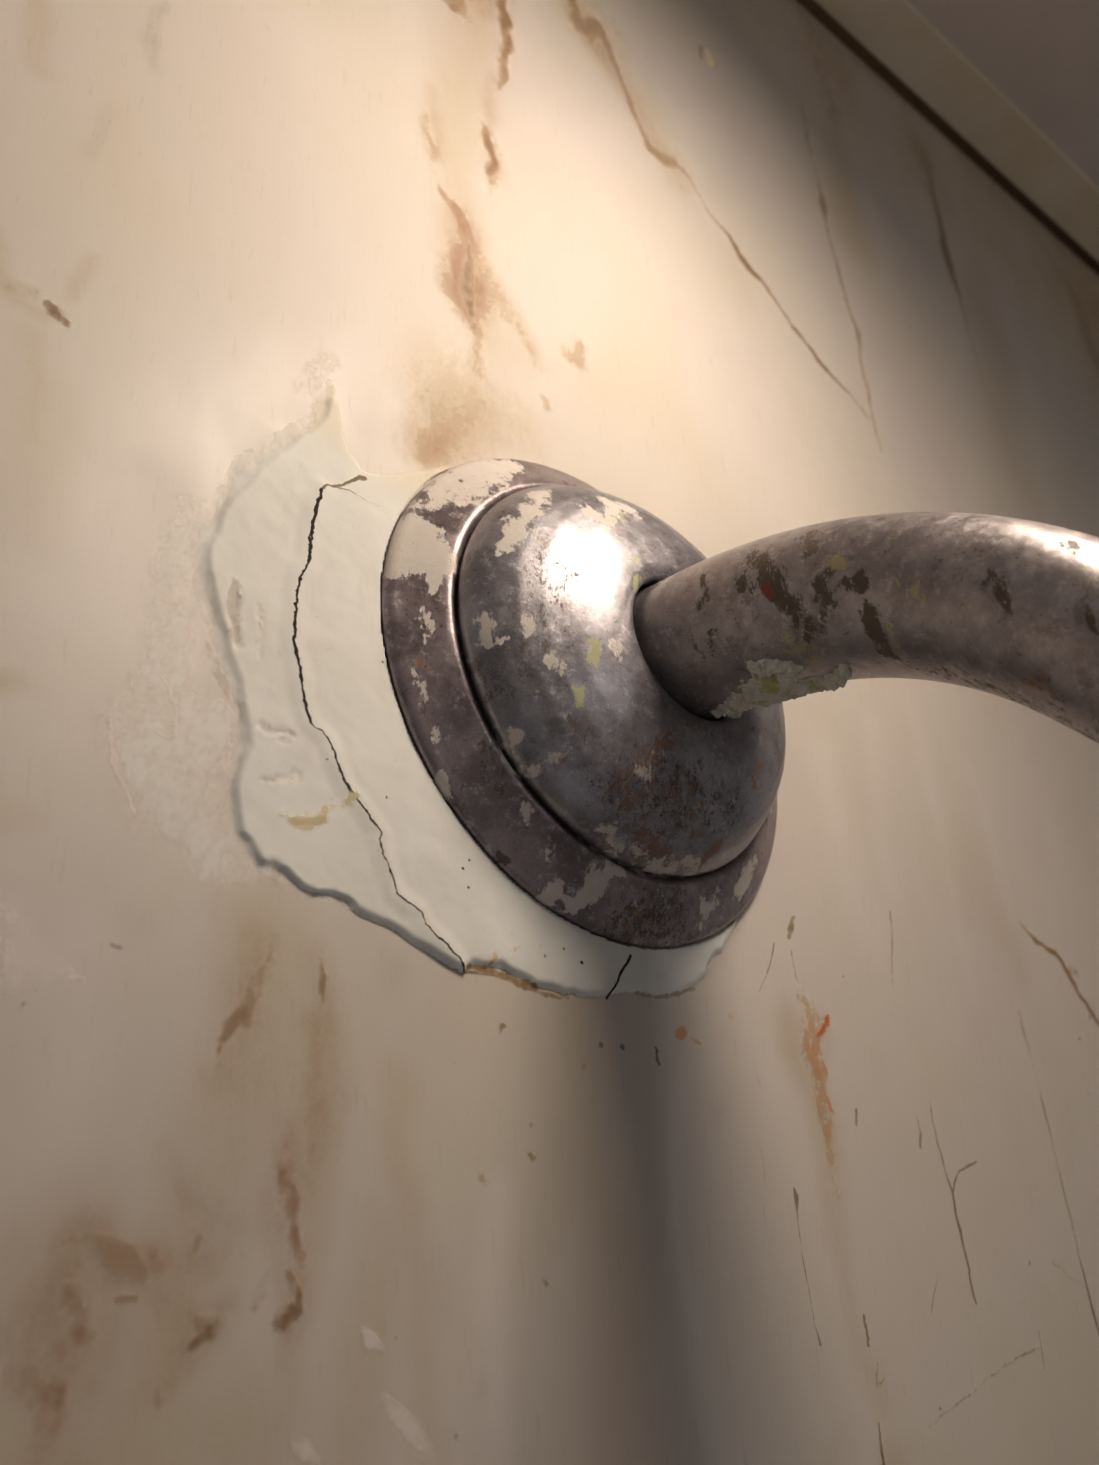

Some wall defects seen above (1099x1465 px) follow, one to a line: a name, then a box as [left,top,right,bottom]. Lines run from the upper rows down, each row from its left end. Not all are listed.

water stain [446,0,514,89]
water stain [439,187,533,376]
water stain [482,125,500,184]
water stain [564,342,585,368]
water stain [569,0,867,416]
crack [803,112,880,445]
crack [292,475,496,976]
peeling [190,356,738,999]
crack [1022,925,1099,1026]
corrosion [802,997,833,1164]
crack [919,1128,977,1304]
crack [1040,1095,1099,1334]